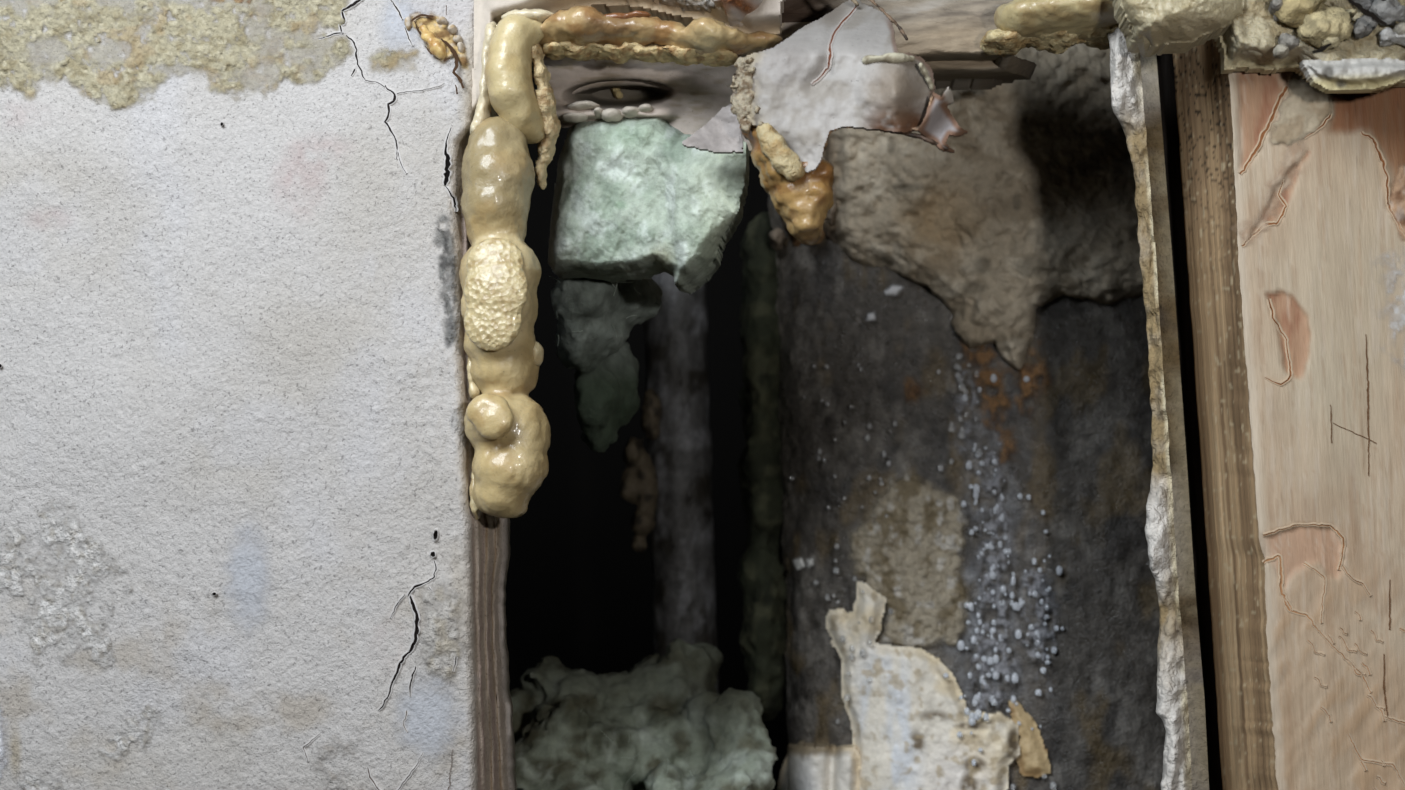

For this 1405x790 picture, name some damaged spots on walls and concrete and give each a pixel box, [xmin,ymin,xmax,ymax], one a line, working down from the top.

damp [0,0,349,110]
crack [318,0,445,174]
crack [442,127,459,212]
corrosion [963,345,1049,463]
damp [850,371,1054,713]
crack [366,560,459,790]